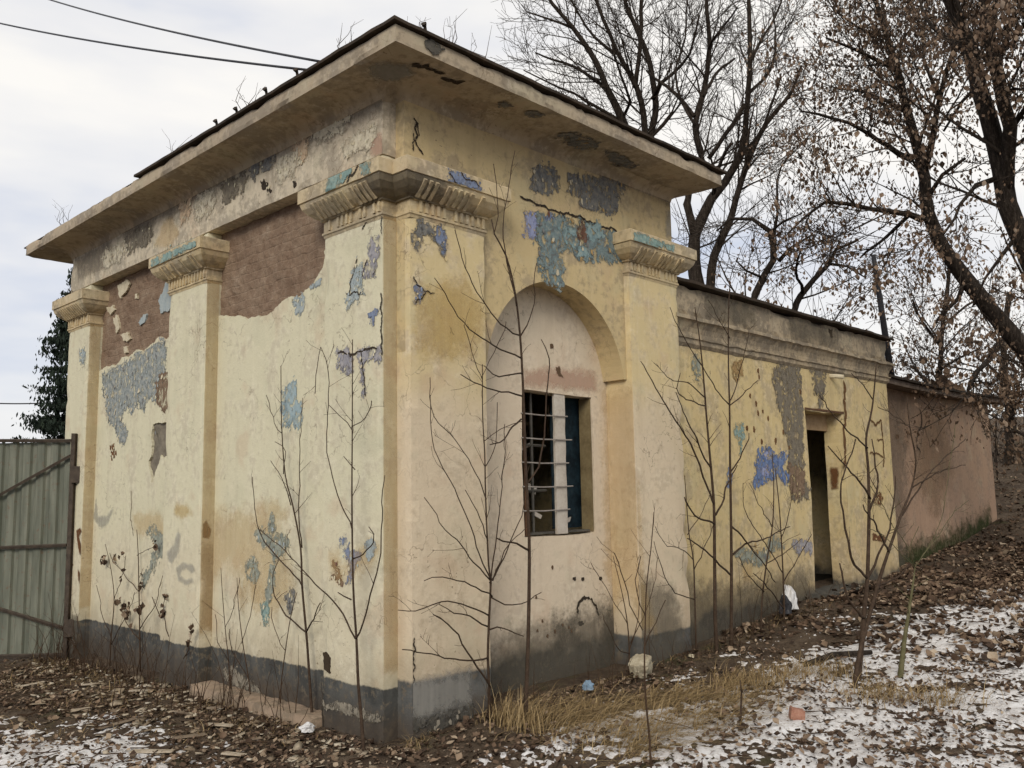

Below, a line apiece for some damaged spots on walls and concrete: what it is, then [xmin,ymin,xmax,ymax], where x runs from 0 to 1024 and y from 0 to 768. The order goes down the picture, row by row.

crack [412,118,423,154]
spalling [220,203,325,320]
peeling [344,234,380,312]
peeling [411,218,447,261]
crack [520,196,617,234]
peeling [521,159,626,294]
spalling [101,221,196,476]
peeling [335,343,382,400]
peeling [734,393,805,501]
peeling [244,511,298,627]
peeling [329,537,377,587]
damp [491,608,615,693]